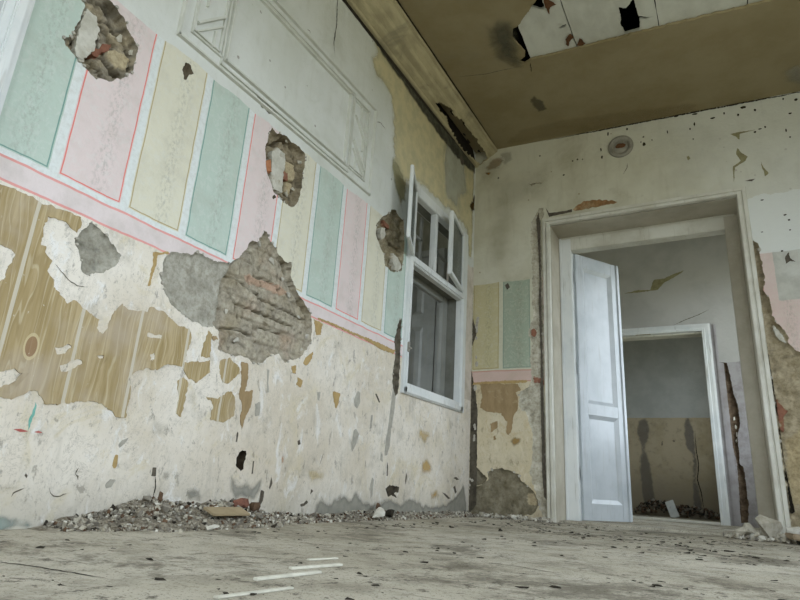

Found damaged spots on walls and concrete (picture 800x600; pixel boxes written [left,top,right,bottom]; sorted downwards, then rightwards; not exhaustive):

flaking render [62,0,139,82]
flaking render [265,128,307,207]
flaking render [74,221,121,276]
flaking render [376,210,405,272]
flaking render [159,231,312,393]
flaking render [468,199,617,519]
flaking render [753,241,800,527]
water stain [638,420,654,502]
water stain [685,419,704,513]